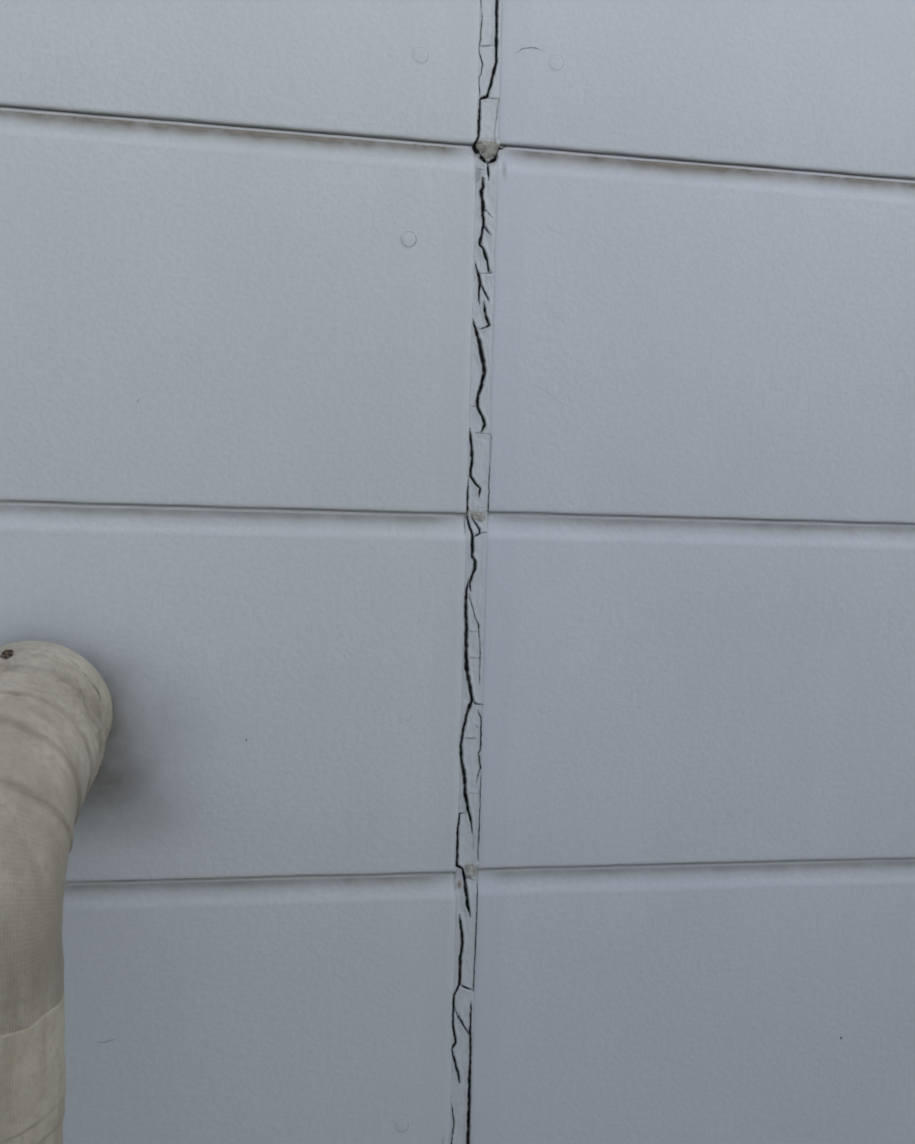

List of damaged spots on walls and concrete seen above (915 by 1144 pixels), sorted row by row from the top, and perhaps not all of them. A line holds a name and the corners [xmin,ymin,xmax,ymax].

crack [451,0,506,1144]